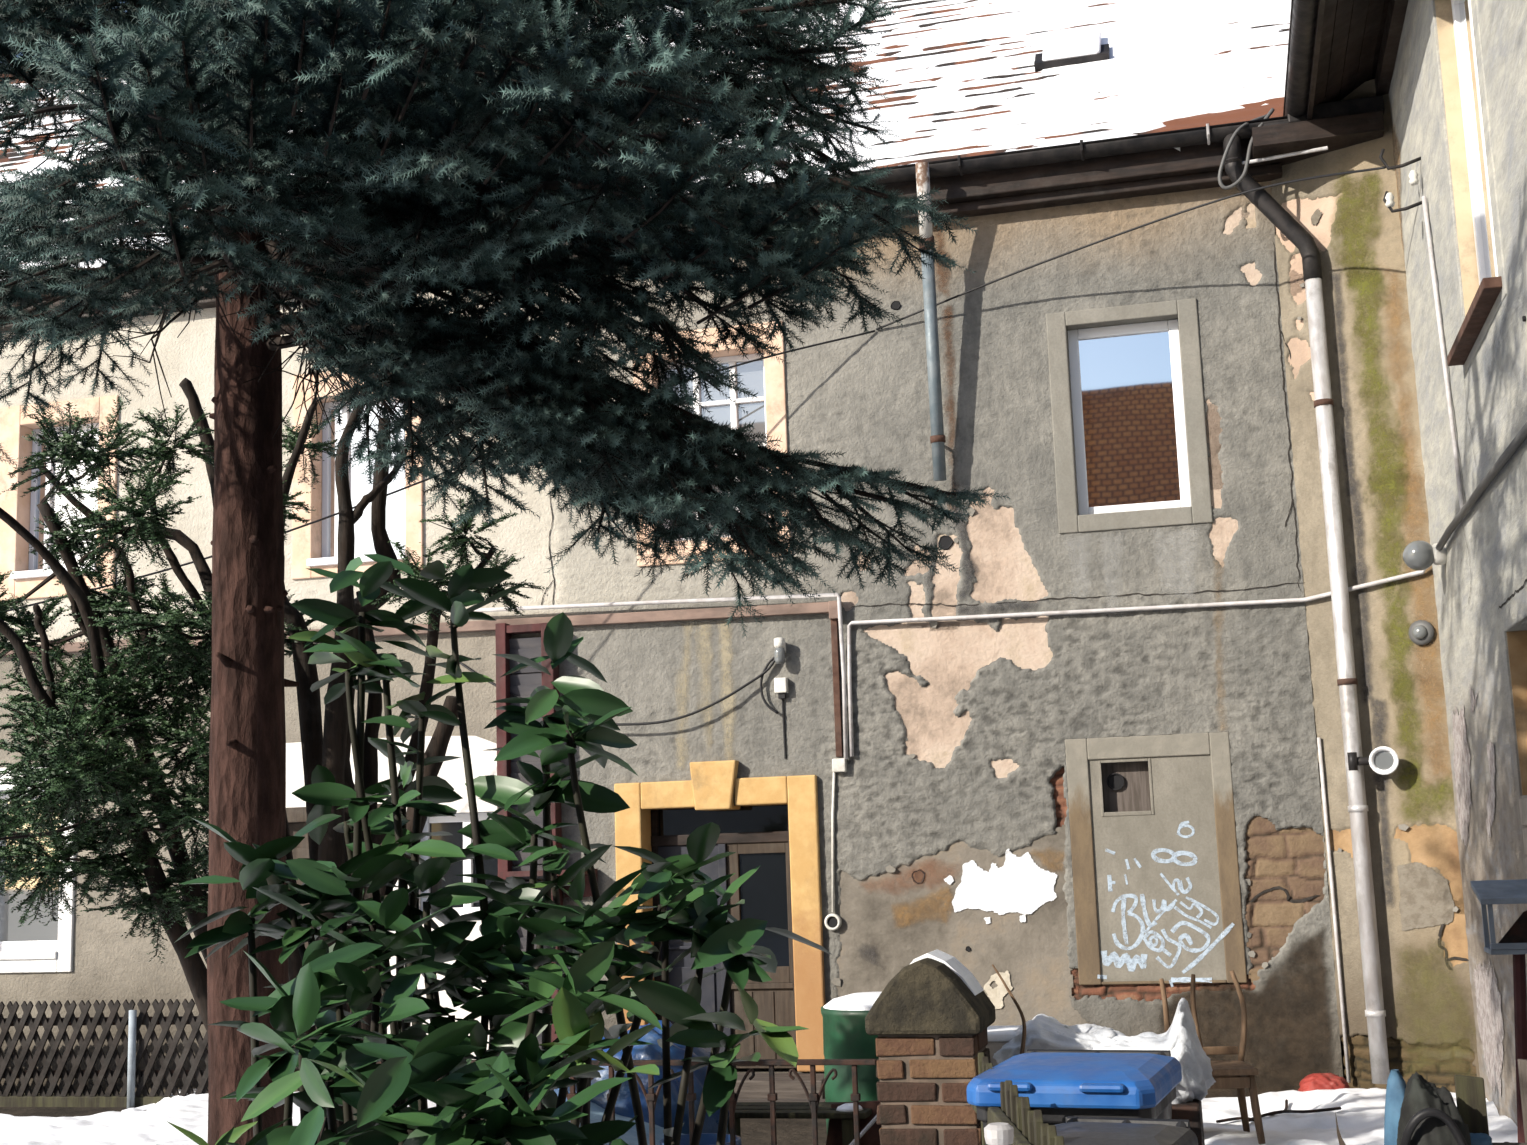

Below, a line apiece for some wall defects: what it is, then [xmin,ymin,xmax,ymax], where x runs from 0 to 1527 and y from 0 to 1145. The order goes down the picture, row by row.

flaking render [1222,203,1256,235]
flaking render [1240,262,1262,286]
flaking render [1275,226,1311,379]
flaking render [1281,193,1342,251]
flaking render [841,591,858,611]
flaking render [863,487,1053,768]
flaking render [1205,399,1238,568]
leakage [1333,175,1454,902]
flaking render [991,759,1019,778]
flaking render [831,767,1353,1026]
flaking render [1341,685,1504,1096]